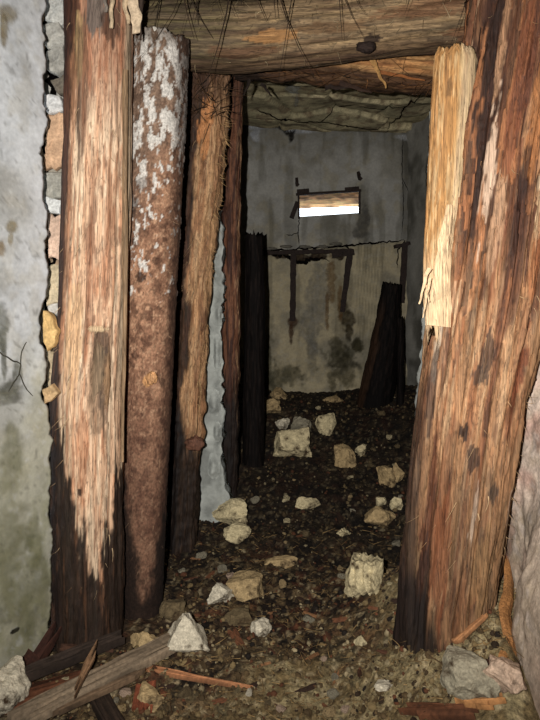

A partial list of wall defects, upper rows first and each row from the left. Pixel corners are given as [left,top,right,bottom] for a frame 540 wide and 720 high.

crack [45,47,59,95]
spalling [42,0,64,404]
crack [258,96,420,268]
crack [0,342,50,423]
leakage [329,304,362,389]